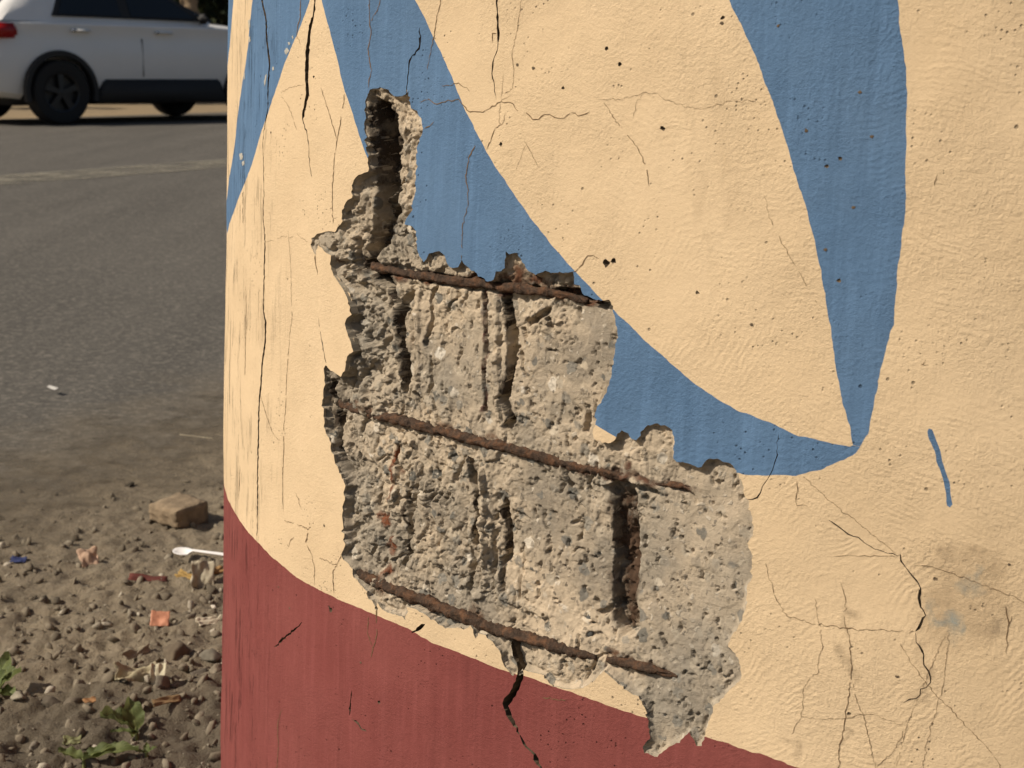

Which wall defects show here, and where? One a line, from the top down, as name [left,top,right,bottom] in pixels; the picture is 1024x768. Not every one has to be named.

crack [238,0,344,591]
corrosion [465,265,546,331]
corrosion [556,286,605,306]
corrosion [329,380,362,426]
corrosion [480,356,516,411]
spalling [311,87,754,757]
corrosion [377,494,415,574]
corrosion [498,503,515,551]
corrosion [604,461,671,626]
crack [766,477,1023,768]
crack [502,640,542,768]